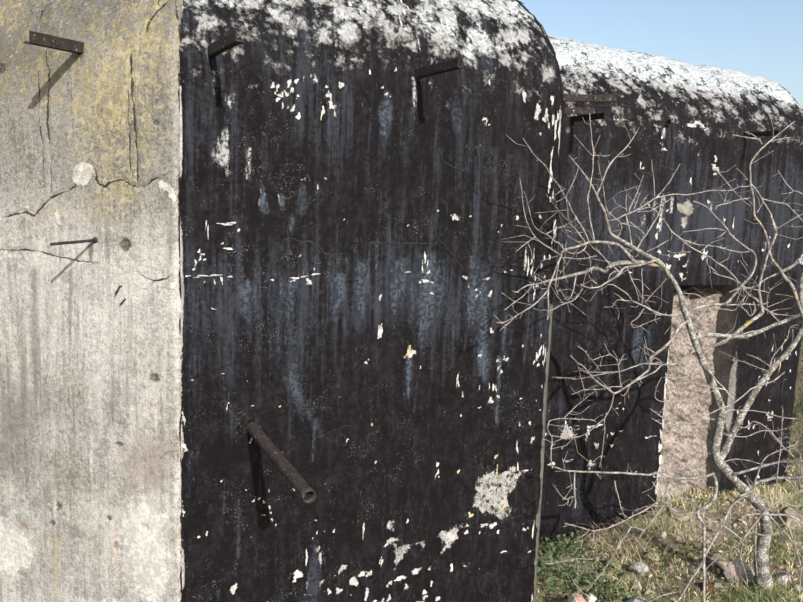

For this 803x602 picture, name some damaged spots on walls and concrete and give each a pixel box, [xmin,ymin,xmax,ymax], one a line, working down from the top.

crack [4,50,168,224]
crack [0,248,97,263]
peeling [439,441,532,553]
peeling [293,529,335,595]
peeling [319,521,431,602]